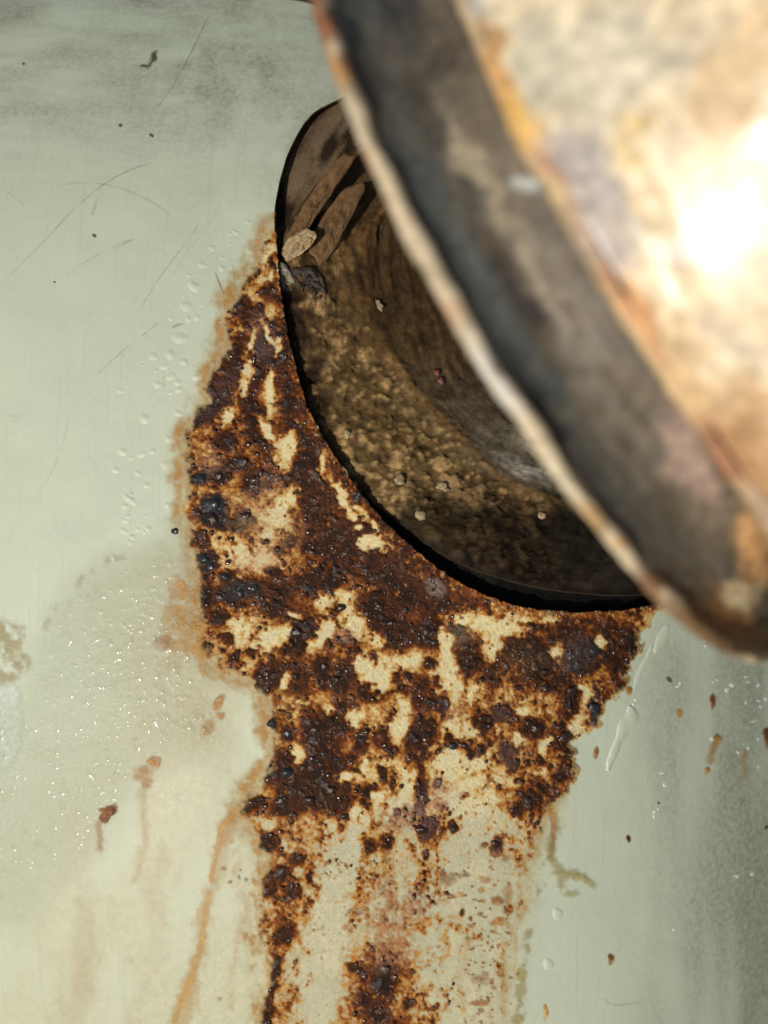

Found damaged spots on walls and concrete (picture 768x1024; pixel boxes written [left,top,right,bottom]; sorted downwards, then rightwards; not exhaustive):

rust [154,214,661,1024]
rust [138,757,160,779]
rust [96,806,116,848]